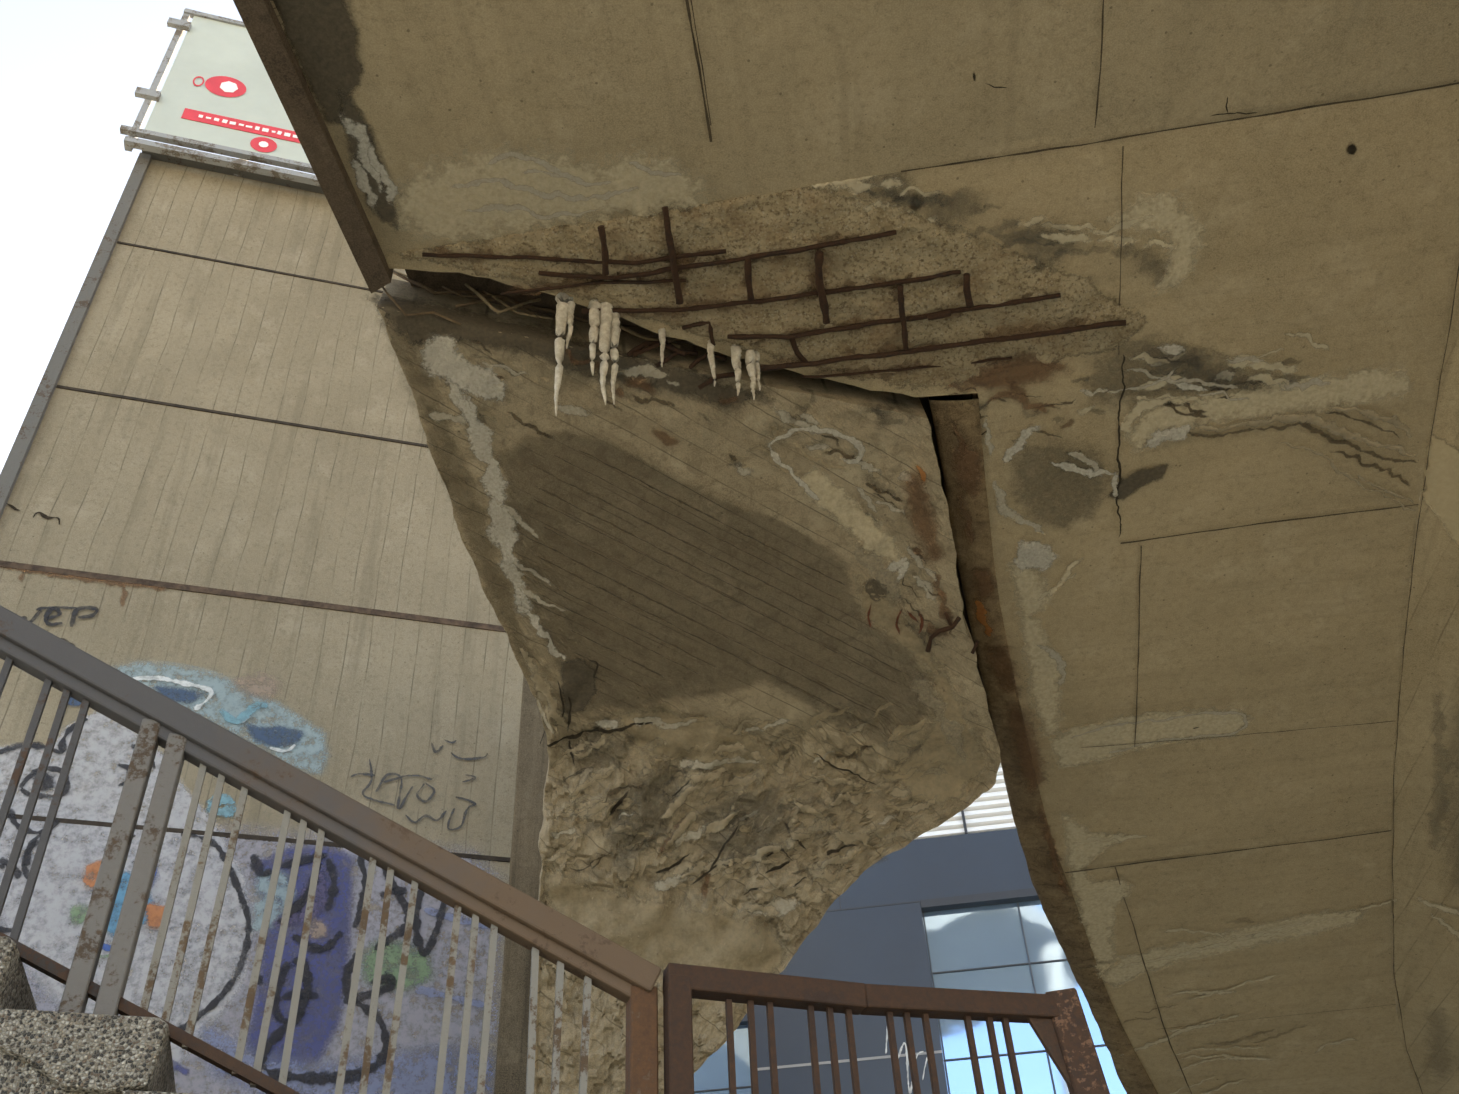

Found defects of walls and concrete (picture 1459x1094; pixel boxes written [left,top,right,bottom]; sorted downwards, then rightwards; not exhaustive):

water stain [272,0,705,243]
spalling [398,186,1147,391]
water stain [1017,192,1204,290]
water stain [371,294,761,660]
water stain [768,410,947,636]
crack [1111,355,1126,536]
water stain [993,481,1250,767]
water stain [948,332,1409,499]
crack [540,719,653,764]
flaking render [520,648,946,973]